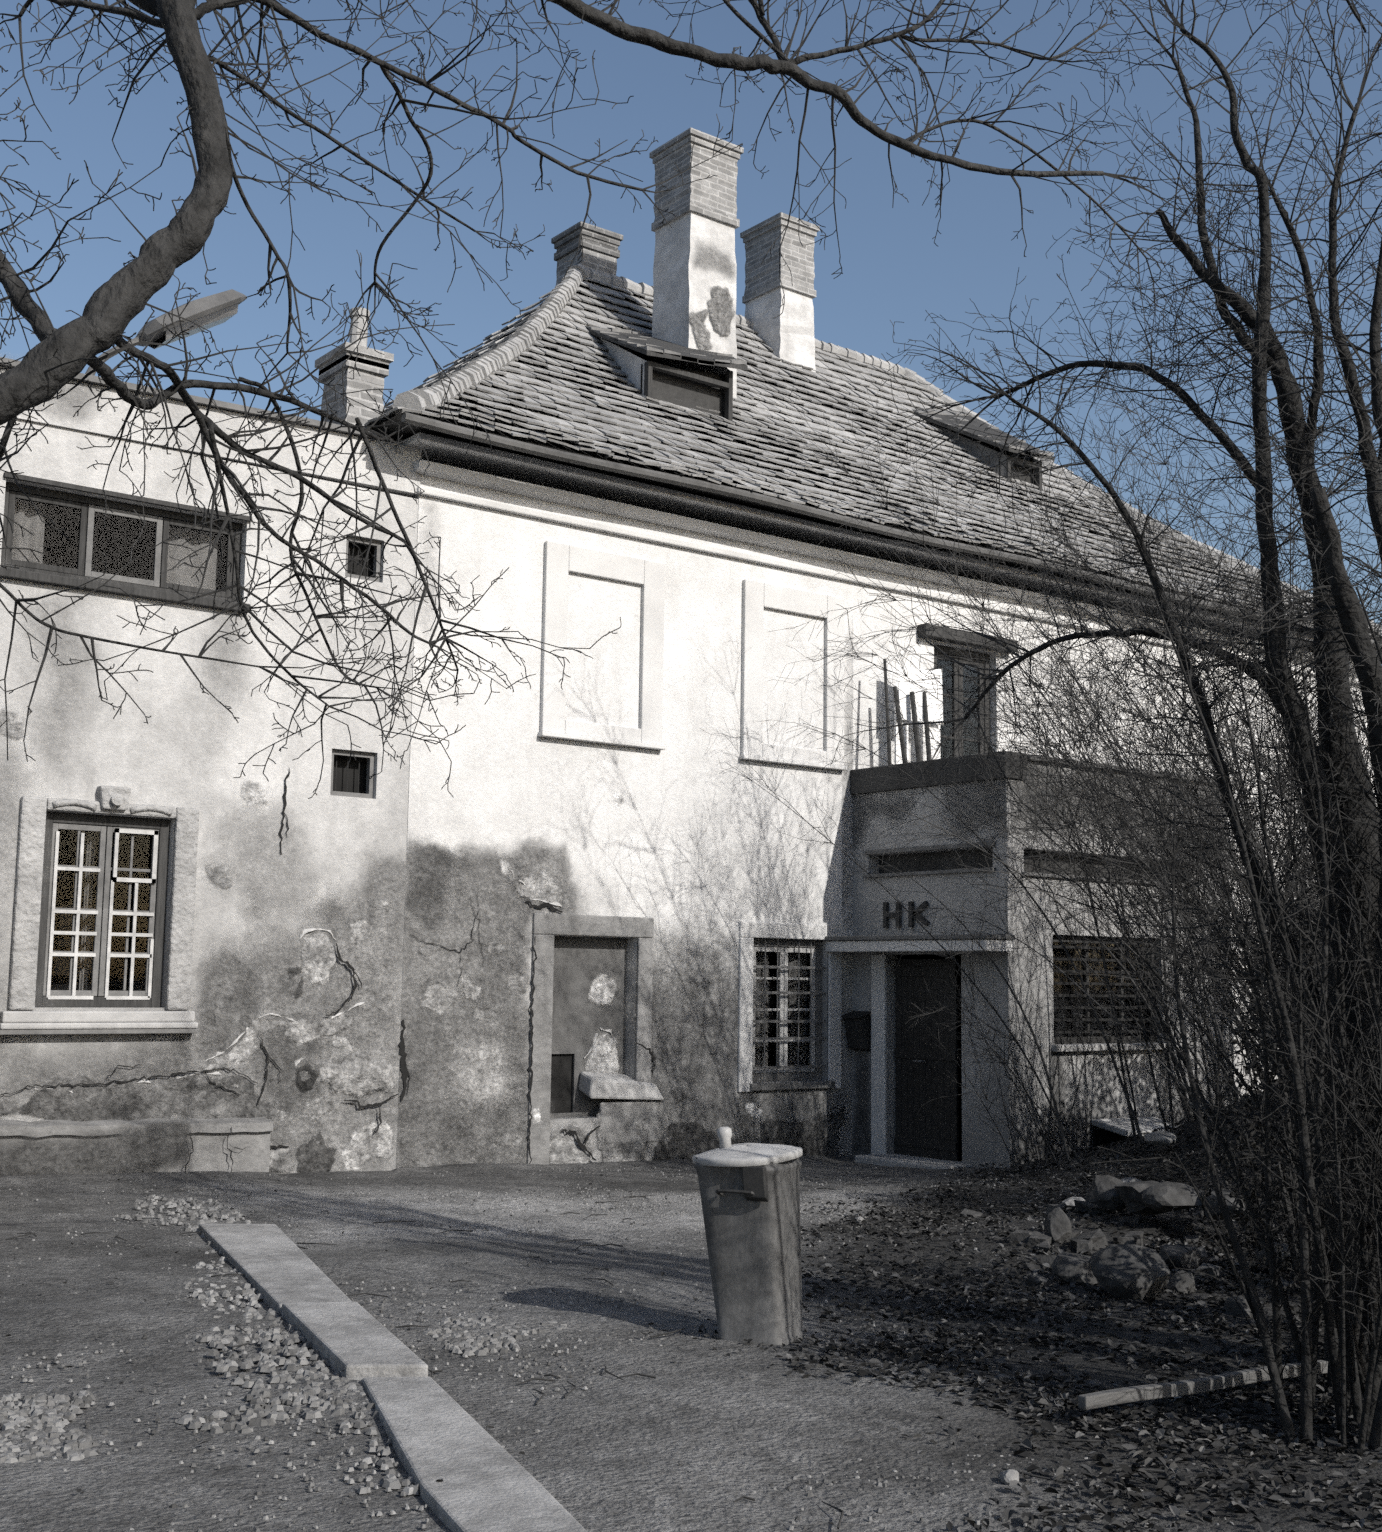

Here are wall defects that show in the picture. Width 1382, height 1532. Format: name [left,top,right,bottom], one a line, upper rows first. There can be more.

spalling [689,286,736,350]
crack [279,769,290,855]
flaking render [500,858,562,907]
leakage [0,844,577,1176]
spalling [288,967,303,999]
crack [326,943,362,1016]
flaking render [588,975,616,1006]
crack [0,1036,289,1172]
flaking render [0,1001,394,1173]
crack [344,1020,410,1133]
flaking render [583,1026,619,1074]